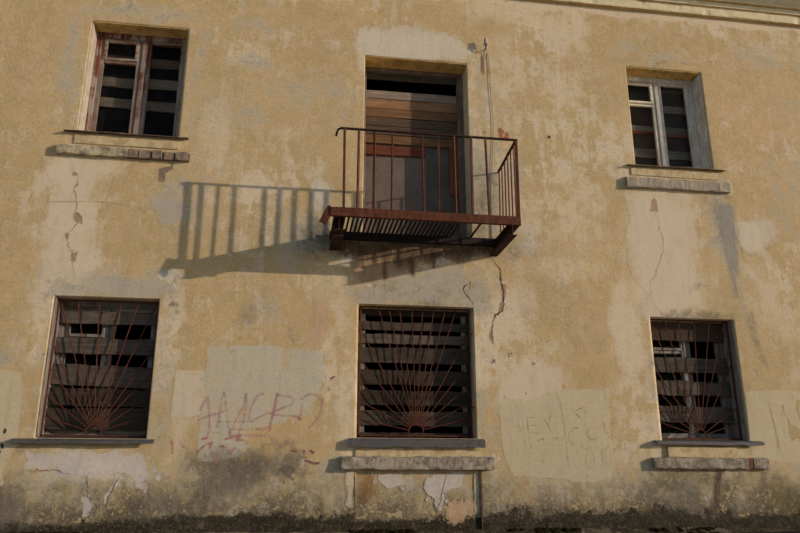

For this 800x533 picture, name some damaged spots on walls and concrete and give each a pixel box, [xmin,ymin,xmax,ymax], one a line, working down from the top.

peeling [349,23,474,63]
crack [65,162,83,292]
peeling [36,152,180,302]
water stain [339,240,493,278]
crack [490,258,506,344]
peeling [24,448,161,531]
peeling [371,470,405,491]
peeling [423,470,481,528]